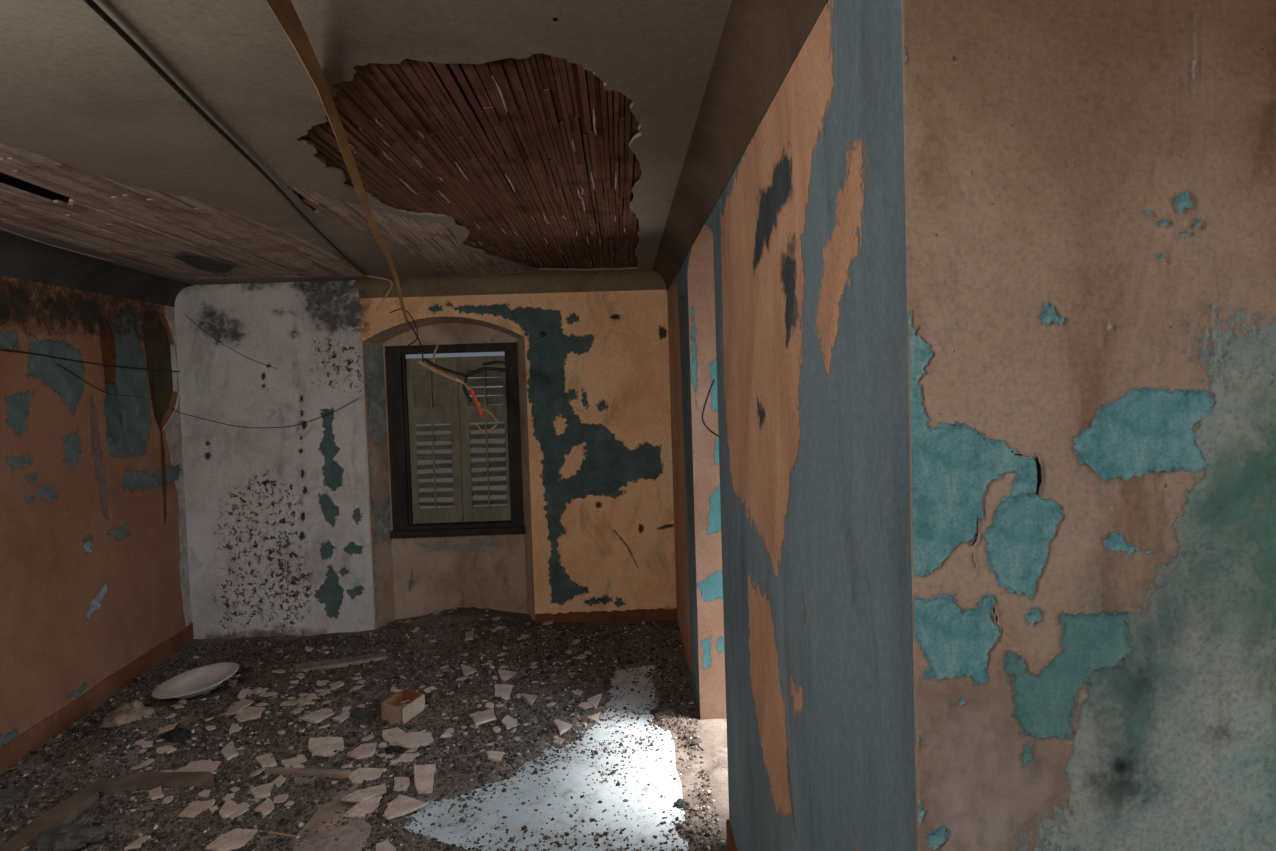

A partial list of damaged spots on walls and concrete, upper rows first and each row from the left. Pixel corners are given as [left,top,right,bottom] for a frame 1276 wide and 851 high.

peeling [0,328,84,466]
water stain [0,275,159,341]
flaking render [103,304,192,627]
water stain [212,471,312,629]
water stain [314,339,362,392]
peeling [315,342,390,619]
peeling [421,0,865,678]
peeling [748,573,804,818]
peeling [909,310,1063,685]
peeling [1004,611,1134,766]
peeling [1073,386,1215,482]
water stain [1018,302,1276,851]